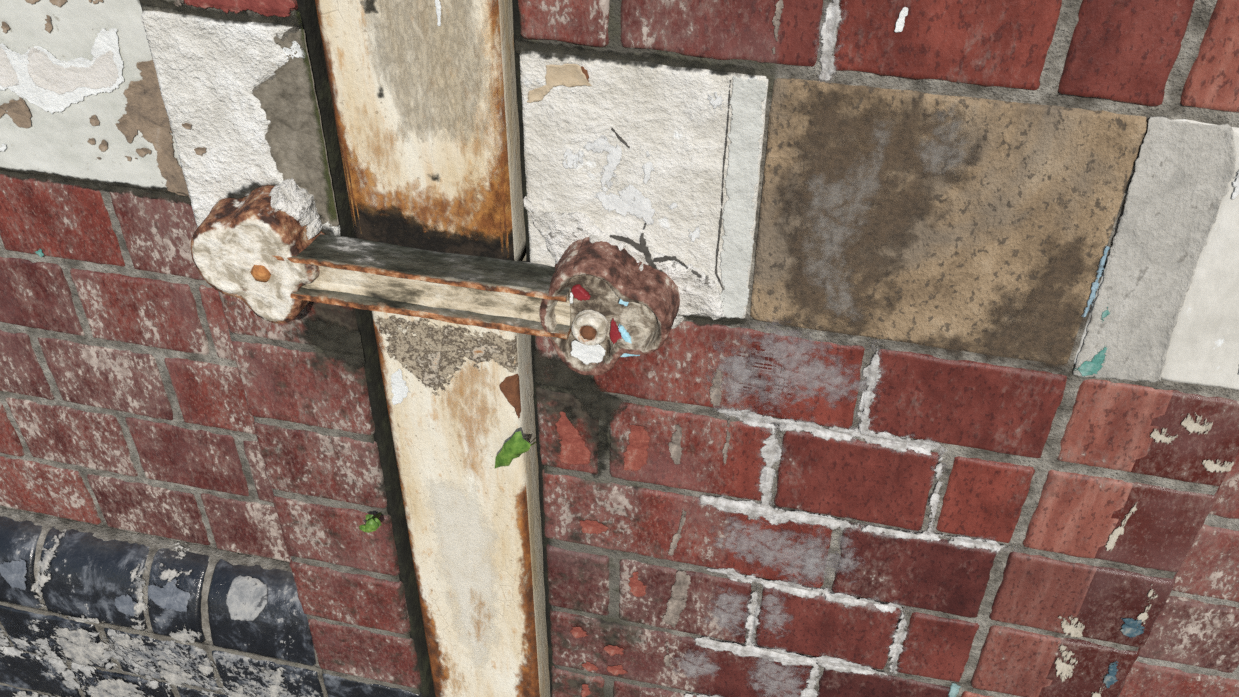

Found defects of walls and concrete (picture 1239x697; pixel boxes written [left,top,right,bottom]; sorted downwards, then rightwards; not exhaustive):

spalling [174,0,295,17]
peeling [0,22,191,198]
flaking render [252,29,339,227]
rust [315,0,513,243]
rust [373,315,518,432]
damp [710,0,979,435]
damp [920,239,1100,371]
peeling [1073,116,1239,382]
rust [395,448,449,697]
rust [515,486,540,697]
damp [664,591,907,697]
damp [700,420,1017,582]